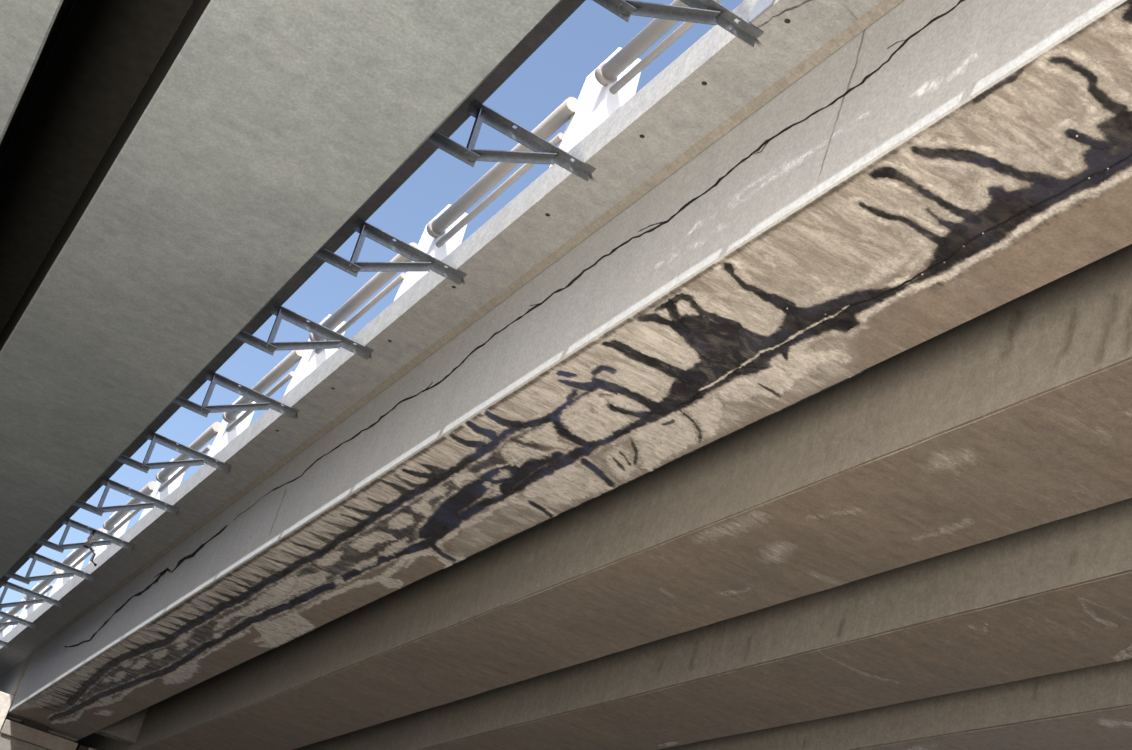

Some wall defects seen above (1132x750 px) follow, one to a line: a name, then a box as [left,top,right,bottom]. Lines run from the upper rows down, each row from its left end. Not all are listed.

water stain [1122,1,1132,24]
water stain [911,52,978,97]
water stain [730,146,824,207]
water stain [886,274,909,287]
crack [674,154,1132,408]
crack [64,0,965,647]
water stain [788,375,827,395]
water stain [806,360,853,383]
water stain [715,399,760,433]
water stain [498,502,541,530]
water stain [454,519,519,550]
spalling [1113,644,1132,661]